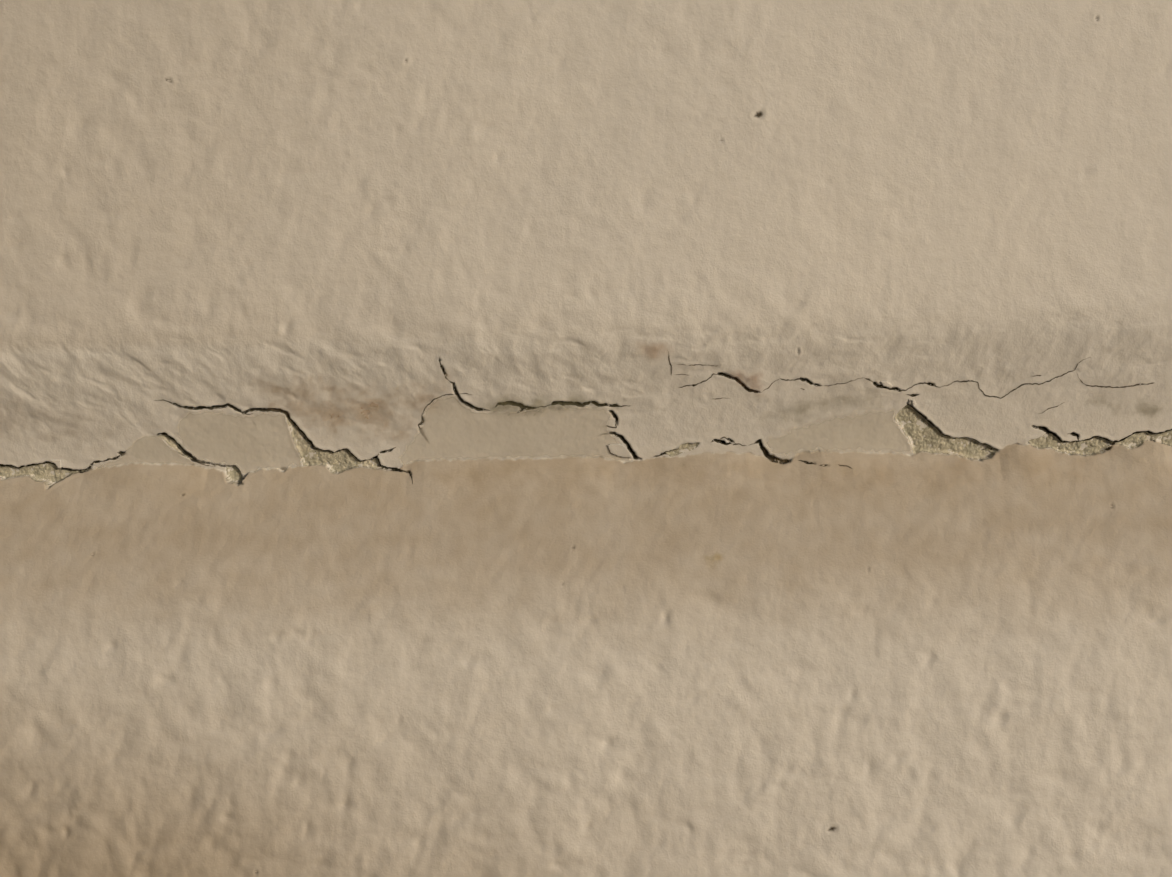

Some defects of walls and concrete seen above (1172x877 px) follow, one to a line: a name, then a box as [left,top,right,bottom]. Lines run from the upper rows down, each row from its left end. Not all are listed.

spalling [0,463,89,487]
spalling [227,466,243,485]
crack [155,399,413,484]
spalling [287,418,387,473]
crack [418,359,851,468]
spalling [666,443,699,456]
crack [668,356,1172,451]
spalling [895,405,998,459]
spalling [1029,430,1172,455]